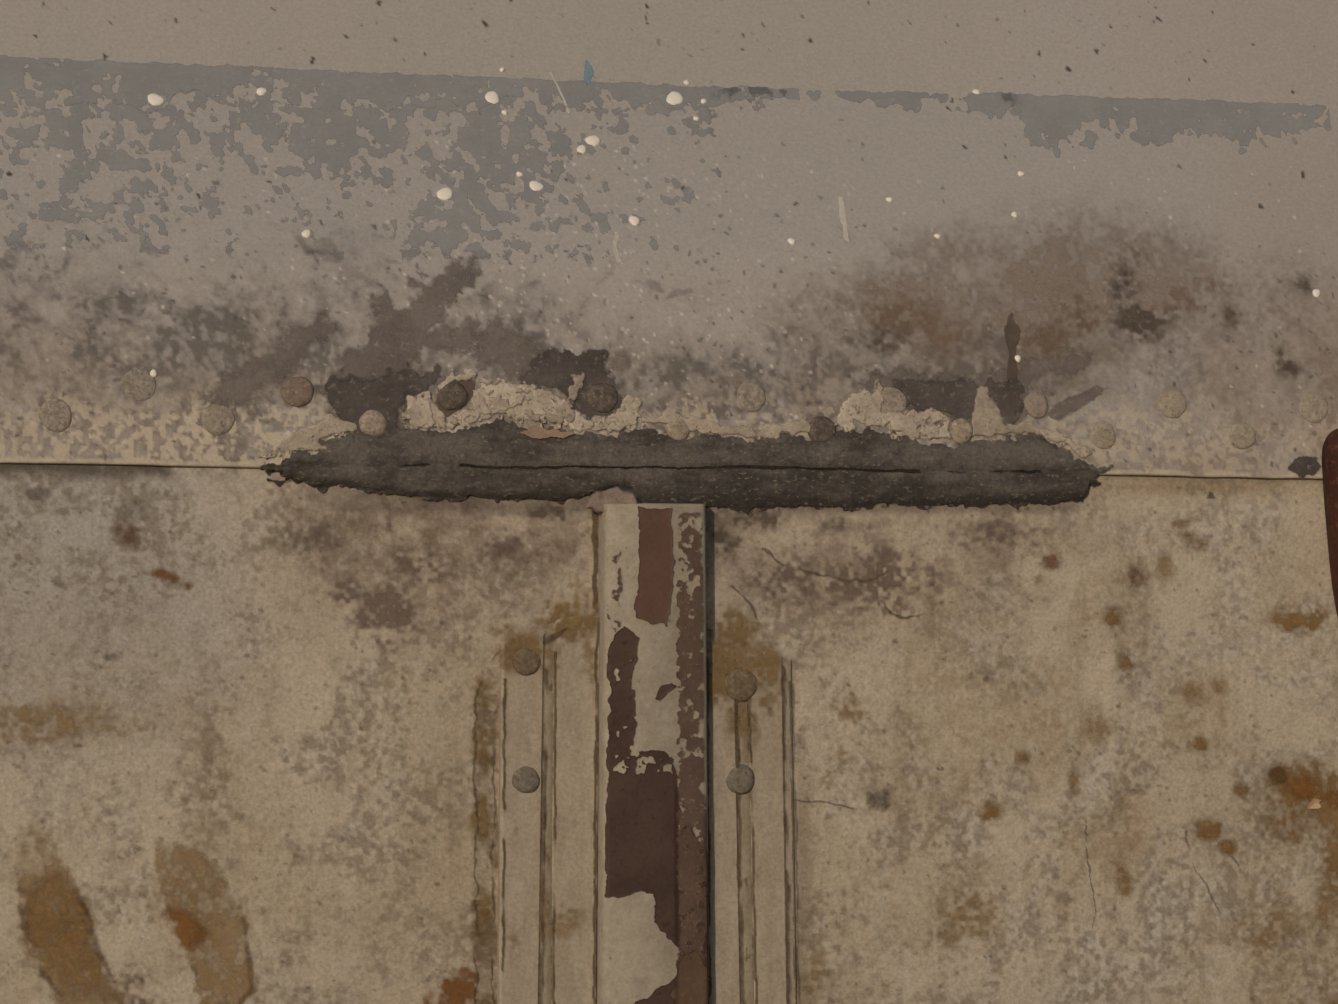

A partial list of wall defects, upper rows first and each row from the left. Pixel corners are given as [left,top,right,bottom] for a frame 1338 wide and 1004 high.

peeling [835,90,1331,158]
peeling [0,55,1114,1004]
corrosion [1273,609,1324,632]
corrosion [1269,764,1338,921]
corrosion [20,840,123,1004]
corrosion [156,846,257,1004]
corrosion [424,968,478,1004]